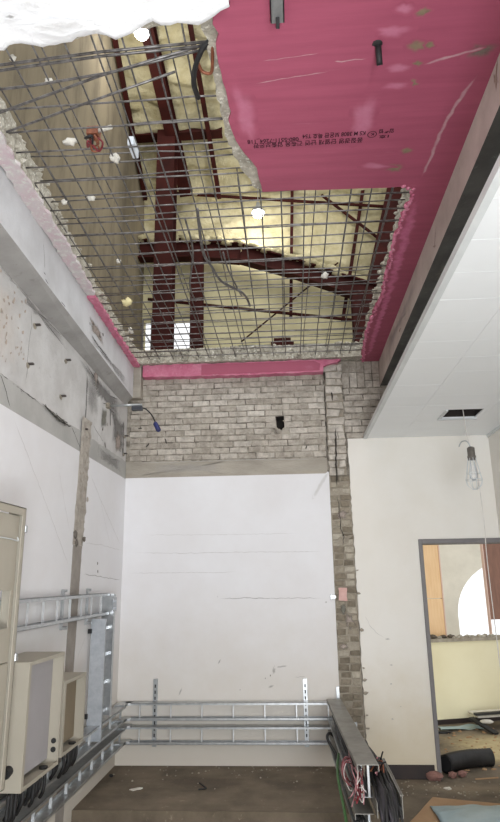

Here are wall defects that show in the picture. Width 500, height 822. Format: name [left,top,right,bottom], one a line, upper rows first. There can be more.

spalling [0,23,409,359]
peeling [0,266,29,386]
crack [0,318,344,580]
crack [217,593,315,601]